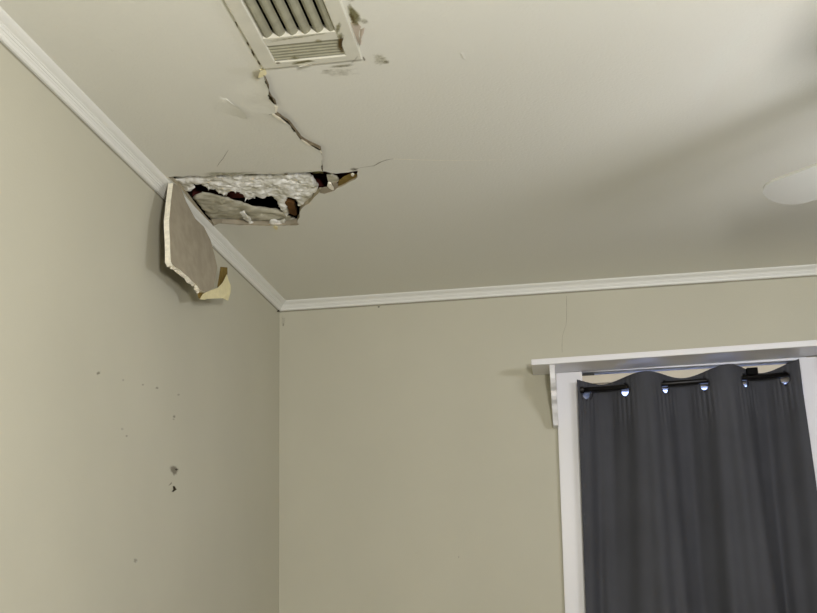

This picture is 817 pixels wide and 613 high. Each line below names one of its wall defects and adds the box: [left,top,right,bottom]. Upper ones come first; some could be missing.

crack [264,77,323,171]